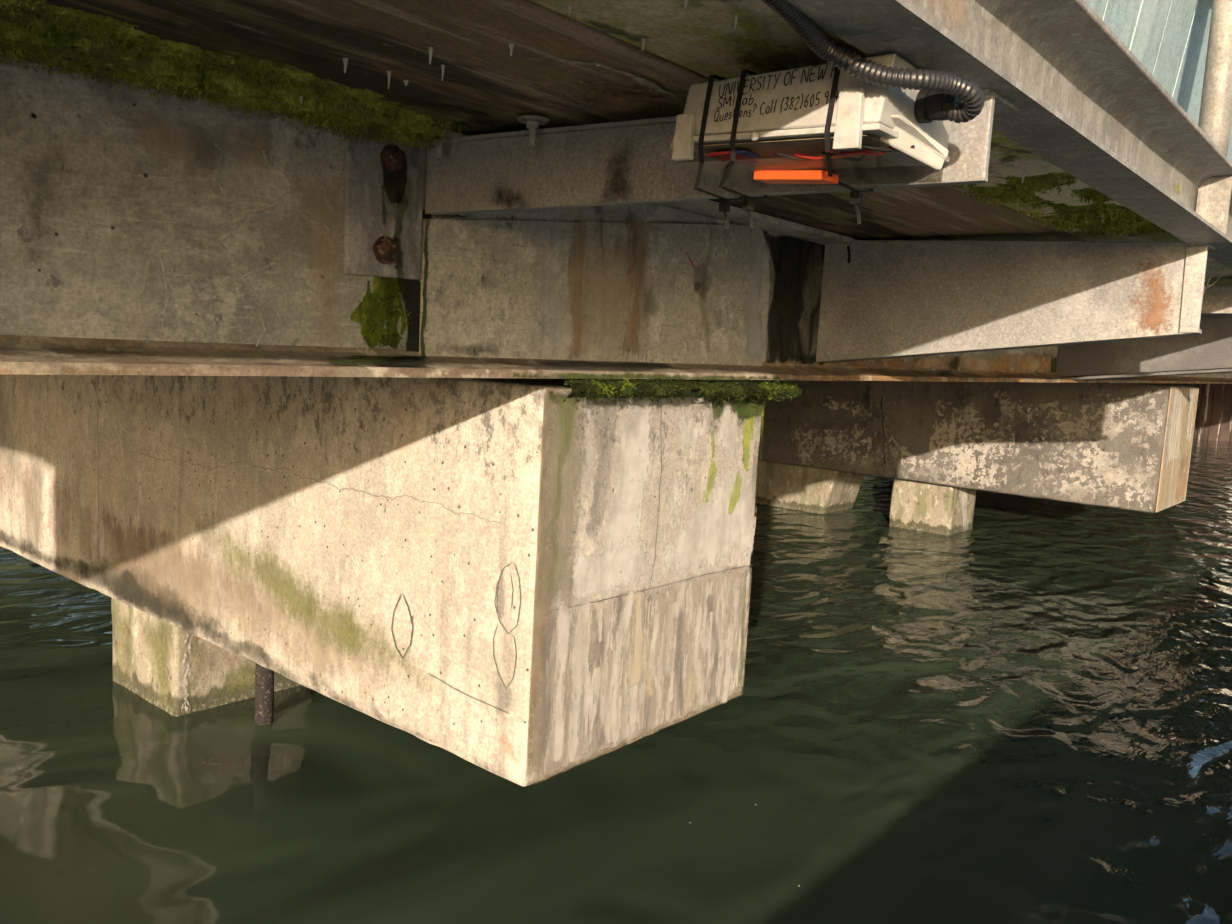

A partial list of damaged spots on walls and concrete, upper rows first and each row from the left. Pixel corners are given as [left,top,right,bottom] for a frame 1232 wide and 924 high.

corrosion [1134,259,1171,334]
water stain [0,532,89,577]
water stain [103,568,282,675]
water stain [526,388,764,776]